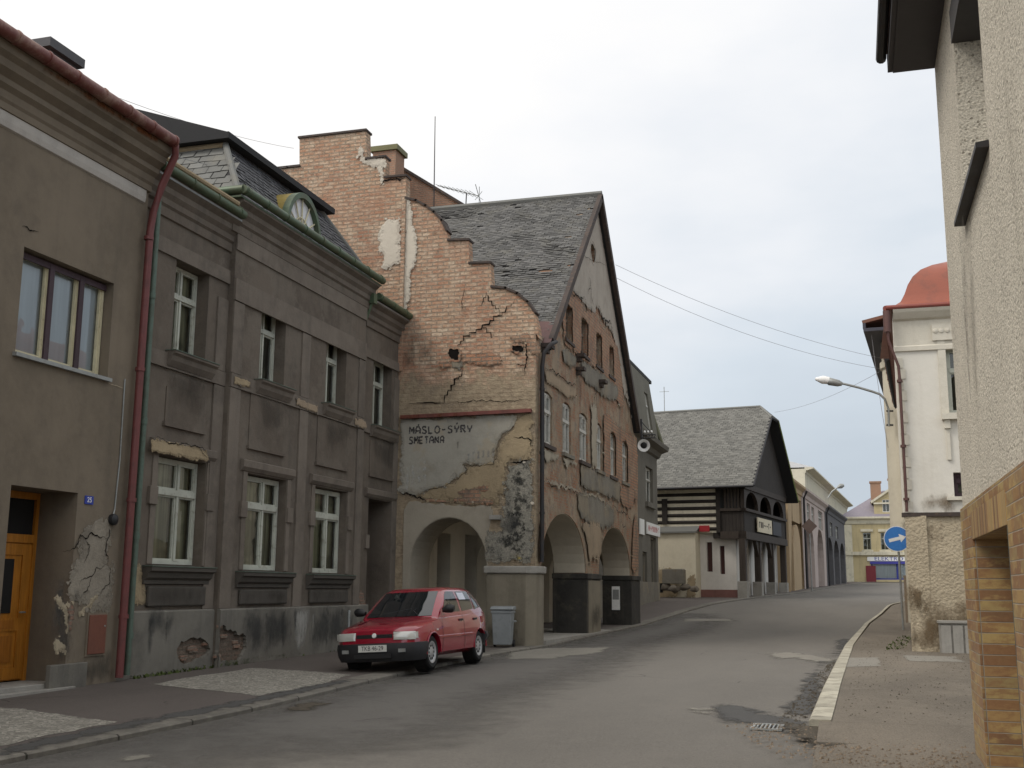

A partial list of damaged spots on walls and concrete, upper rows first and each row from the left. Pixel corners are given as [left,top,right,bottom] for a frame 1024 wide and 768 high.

flaking render [356,146,387,185]
flaking render [378,199,418,309]
crack [458,292,514,345]
crack [409,373,530,404]
flaking render [545,215,639,573]
flaking render [151,438,209,462]
flaking render [397,413,577,565]
water stain [497,472,527,553]
crack [401,428,631,528]
flaking render [53,516,115,655]
crack [64,524,111,594]
water stain [248,610,351,646]